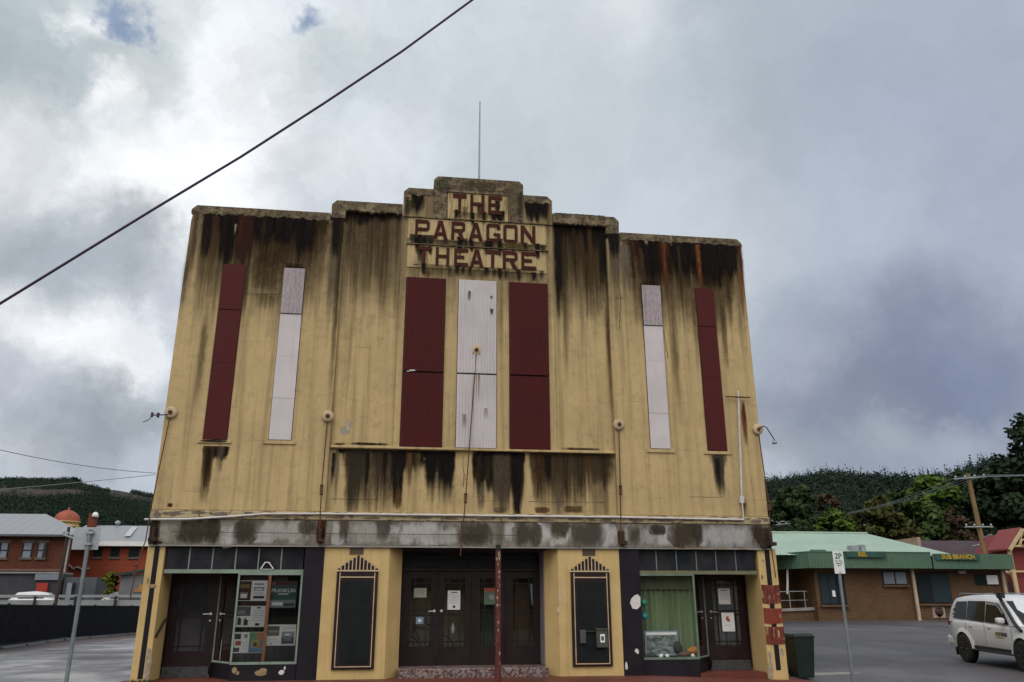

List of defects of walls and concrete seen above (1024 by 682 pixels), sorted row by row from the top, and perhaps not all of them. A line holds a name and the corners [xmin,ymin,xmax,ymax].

water stain [194,194,425,328]
water stain [410,234,434,271]
water stain [454,191,744,351]
water stain [150,440,772,548]